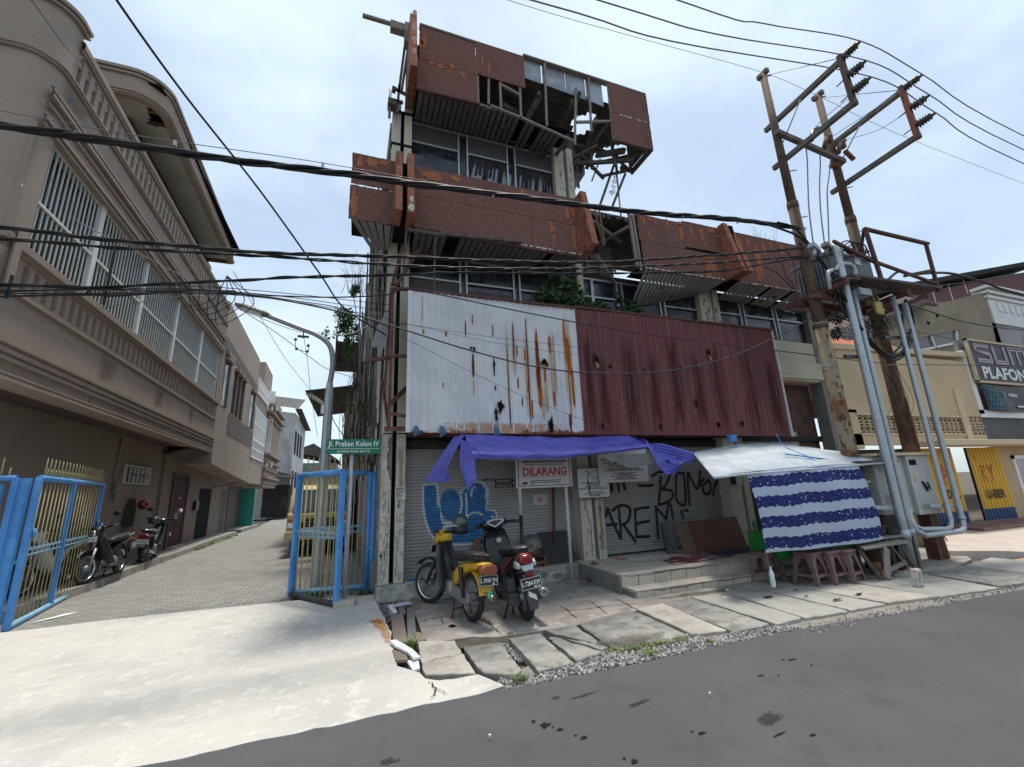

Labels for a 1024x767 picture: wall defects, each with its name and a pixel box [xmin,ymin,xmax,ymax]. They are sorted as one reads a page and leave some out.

rust [412,318,613,435]
rust [626,348,762,431]
crack [421,653,470,696]